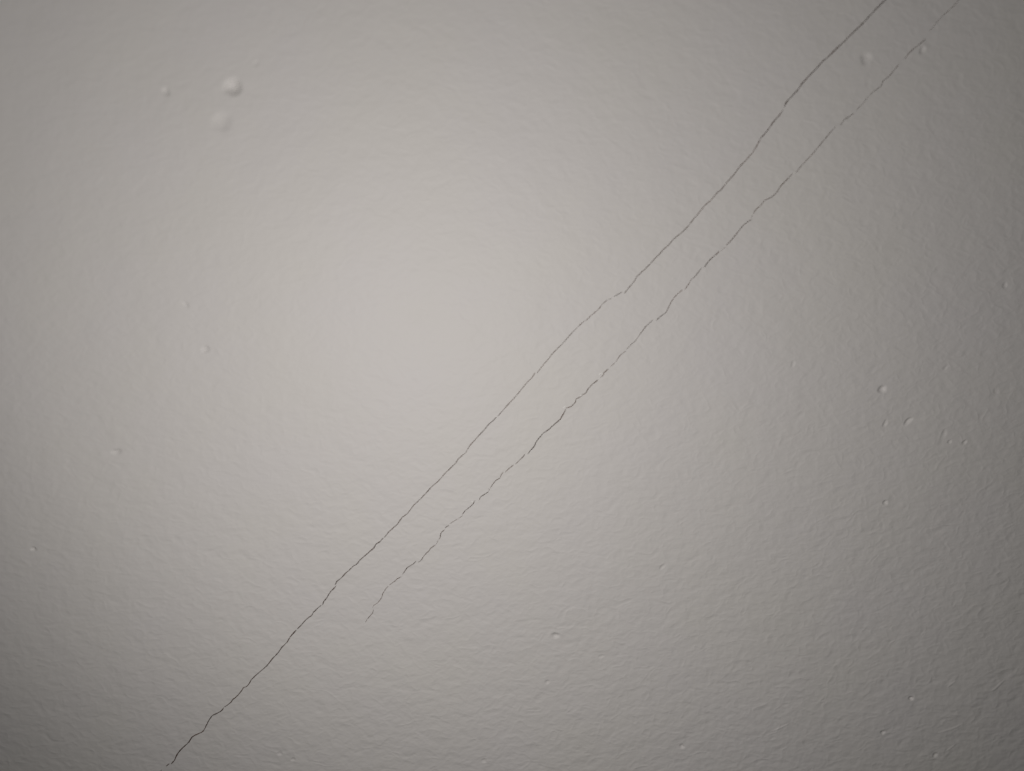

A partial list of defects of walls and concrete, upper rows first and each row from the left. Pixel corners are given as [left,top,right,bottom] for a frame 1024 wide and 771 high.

crack [166,0,959,766]